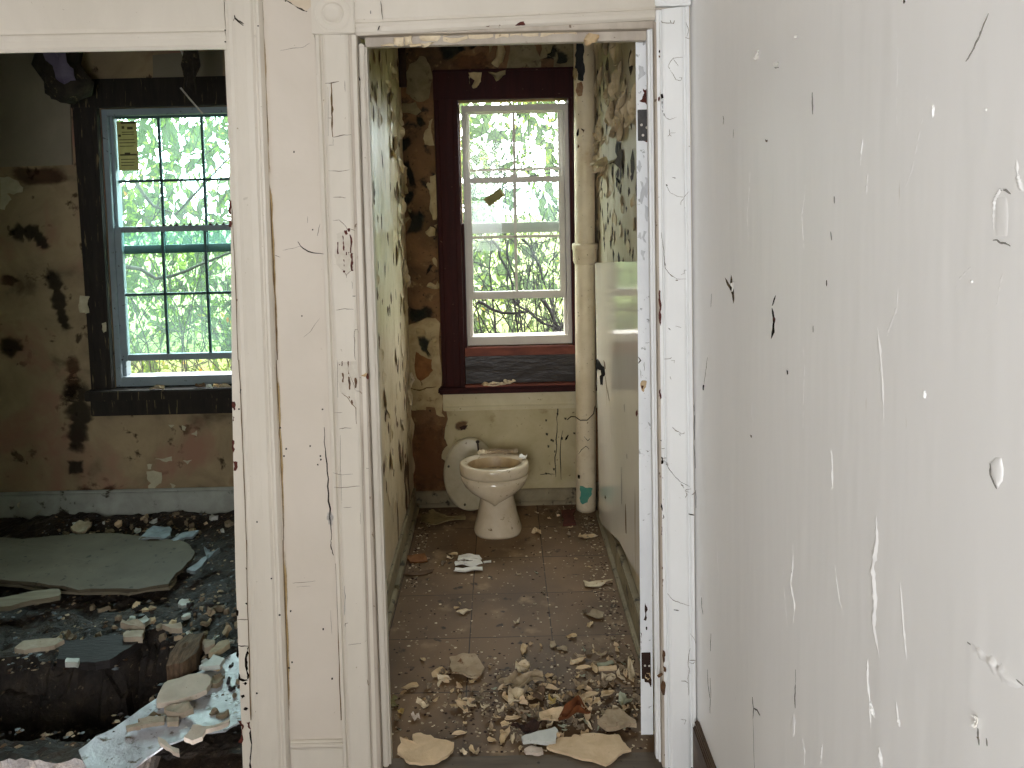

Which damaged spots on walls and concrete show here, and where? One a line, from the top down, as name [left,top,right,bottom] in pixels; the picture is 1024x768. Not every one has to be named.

crack [966,13,989,61]
water stain [14,167,66,184]
water stain [11,224,49,249]
peeling [333,220,355,278]
water stain [46,271,69,329]
peeling [78,296,90,314]
peeling [359,21,664,541]
water stain [1,338,23,358]
water stain [61,359,92,474]
peeling [146,456,191,489]
crack [295,412,369,720]
peeling [597,650,666,695]